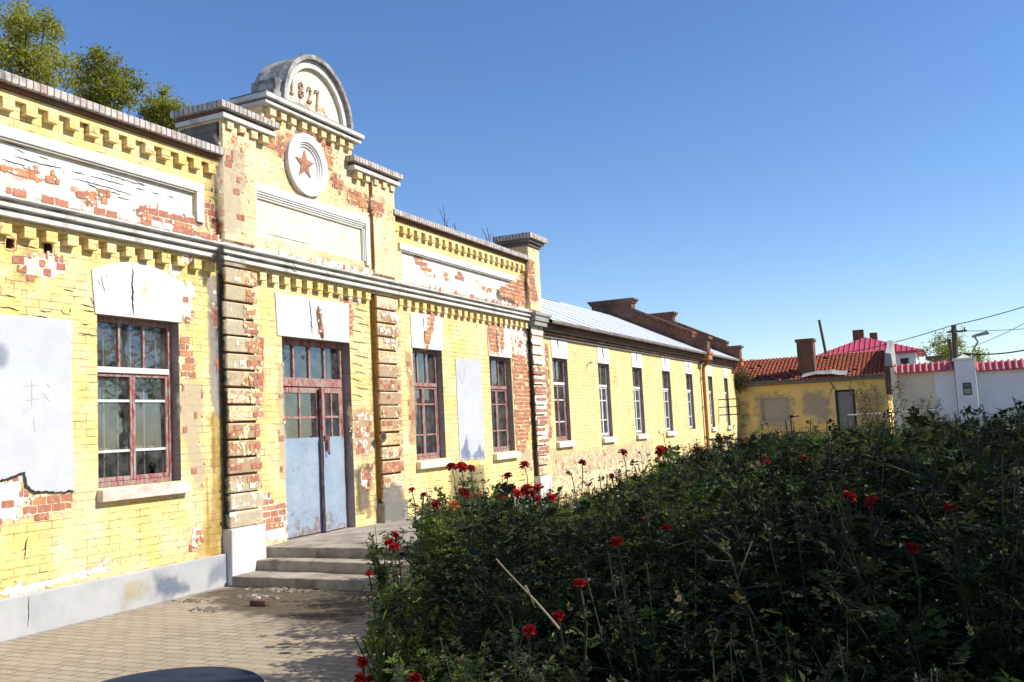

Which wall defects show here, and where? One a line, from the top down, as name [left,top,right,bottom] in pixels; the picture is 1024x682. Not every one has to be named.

spalling [265,129,385,219]
crack [3,270,134,336]
flaking render [0,142,288,542]
spalling [350,308,416,500]
spalling [277,249,539,312]
spalling [488,322,651,499]